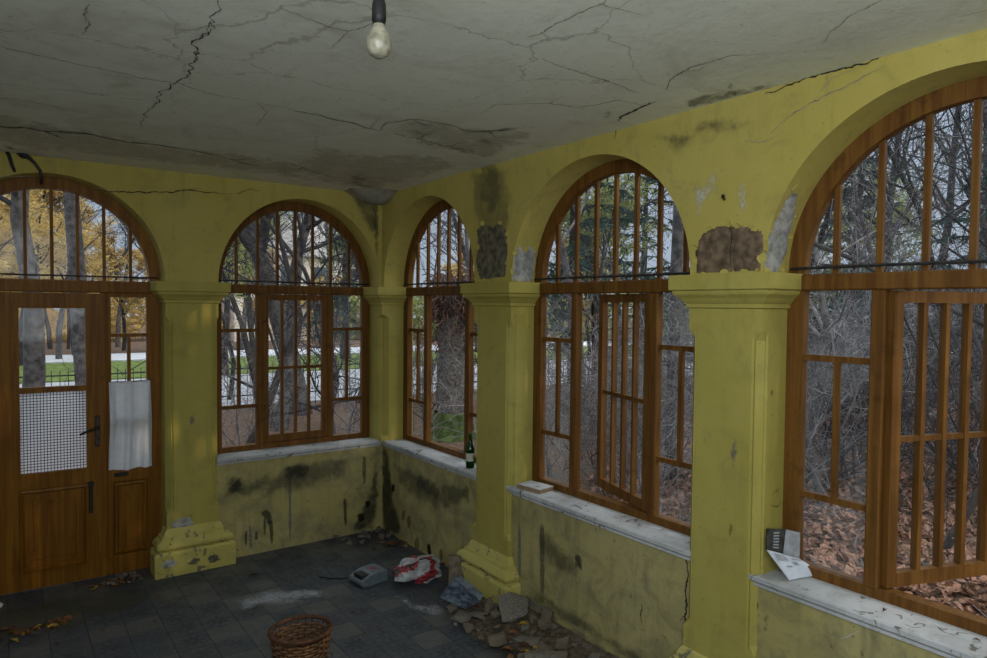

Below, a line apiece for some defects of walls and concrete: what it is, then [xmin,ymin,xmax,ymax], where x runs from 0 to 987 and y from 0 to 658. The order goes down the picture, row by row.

crack [0,0,516,194]
crack [529,0,759,136]
flaking render [475,221,538,282]
flaking render [691,184,801,274]
water stain [245,510,273,547]
water stain [272,462,341,532]
water stain [343,451,465,533]
water stain [528,527,581,613]